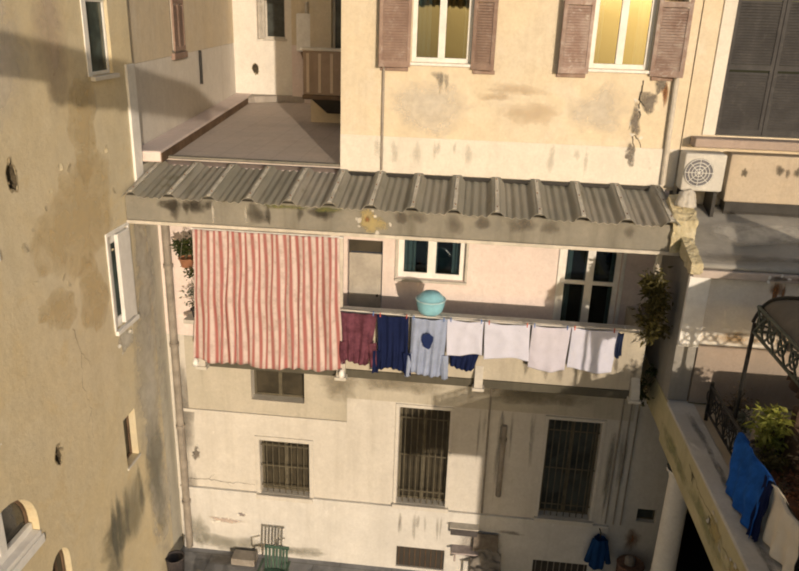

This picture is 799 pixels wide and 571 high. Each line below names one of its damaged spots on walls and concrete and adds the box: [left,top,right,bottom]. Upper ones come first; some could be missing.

crack [628,80,647,148]
spalling [5,157,19,193]
spalling [355,210,392,235]
spalling [54,444,63,466]